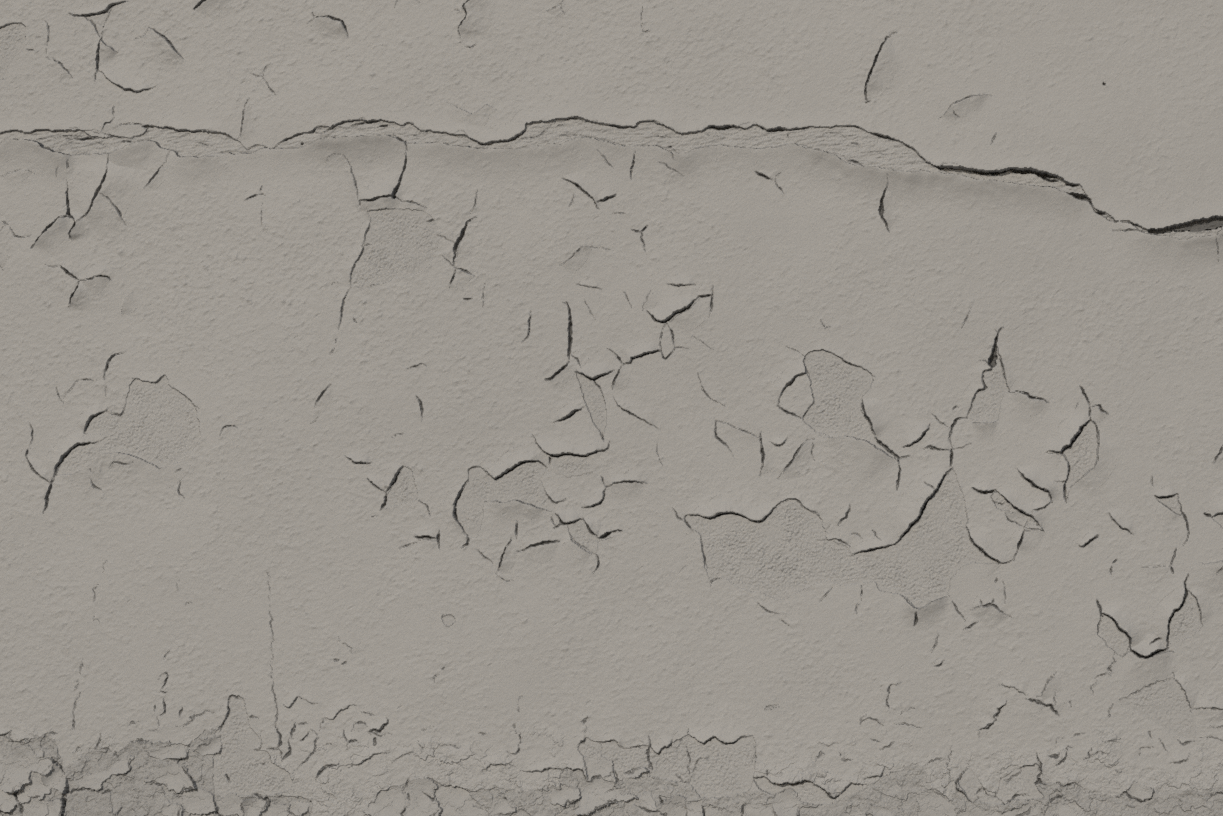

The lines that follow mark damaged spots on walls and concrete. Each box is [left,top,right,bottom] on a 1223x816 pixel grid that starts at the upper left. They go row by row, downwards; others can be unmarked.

crack [137,29,182,62]
crack [194,0,229,14]
crack [244,188,259,201]
crack [566,175,648,236]
peeling [0,102,1223,330]
crack [758,171,778,180]
peeling [21,373,200,507]
crack [347,454,371,464]
peeling [443,310,659,572]
peeling [673,324,1117,625]
peeling [0,688,413,816]
peeling [482,709,1223,816]